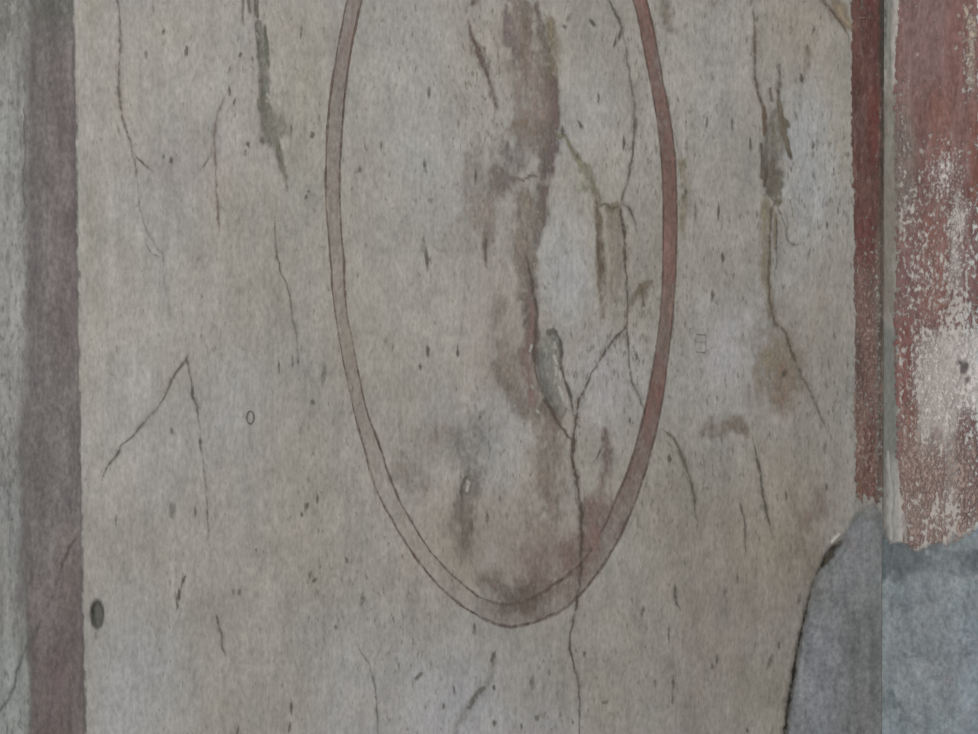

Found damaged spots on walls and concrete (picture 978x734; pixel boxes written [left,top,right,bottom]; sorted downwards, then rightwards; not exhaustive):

crack [163,358,198,414]
crack [528,1,641,716]
damp [556,134,619,291]
crack [767,207,807,385]
peeling [898,329,978,549]
peeling [920,139,971,309]